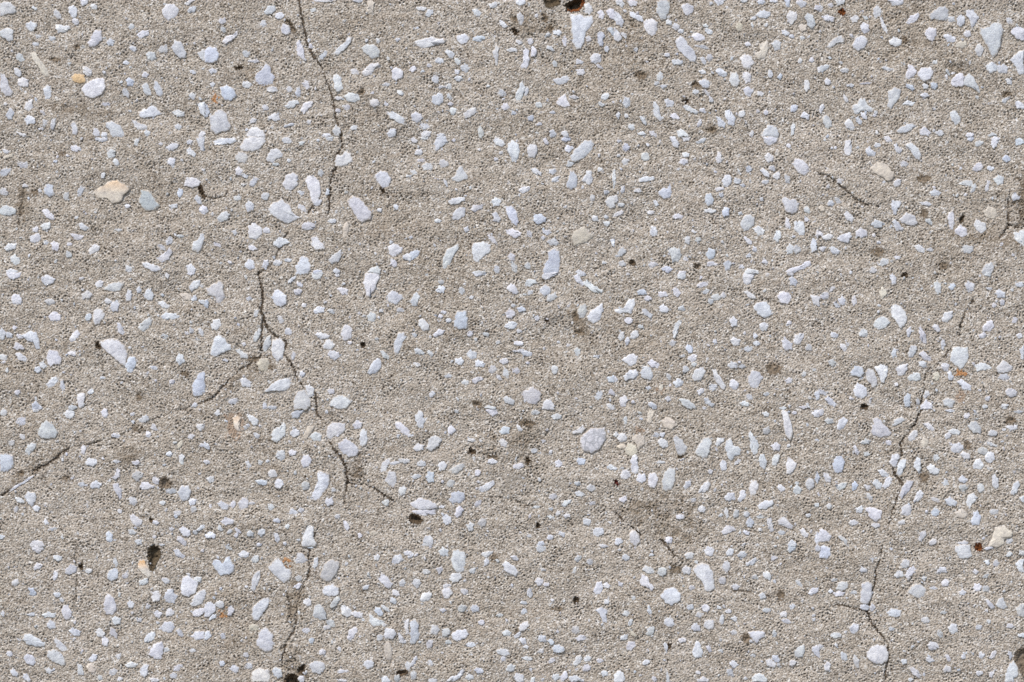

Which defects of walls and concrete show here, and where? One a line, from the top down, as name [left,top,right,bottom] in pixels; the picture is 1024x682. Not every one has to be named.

crack [298,0,344,216]
crack [0,431,128,496]
crack [150,231,394,502]
crack [834,298,974,679]